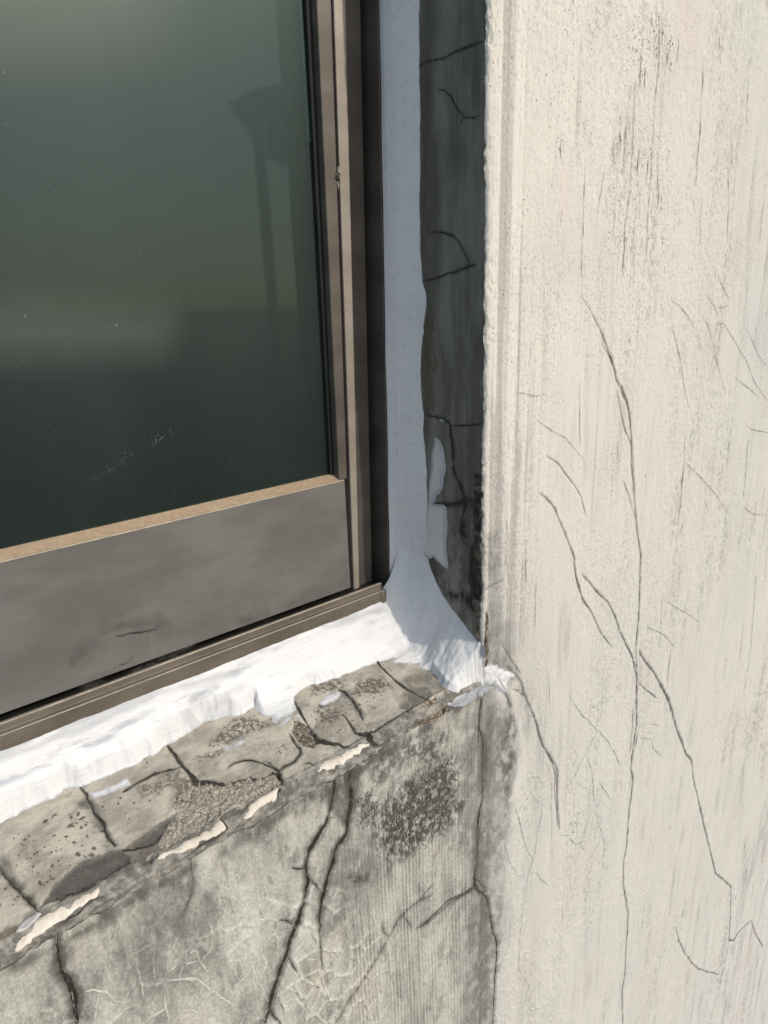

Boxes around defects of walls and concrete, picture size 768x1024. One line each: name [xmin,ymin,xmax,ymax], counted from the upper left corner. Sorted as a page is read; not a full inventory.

peeling [425,437,448,569]
damp [449,473,484,611]
spalling [280,682,389,754]
crack [549,299,763,1020]
crack [0,868,105,1024]
flaking render [15,888,99,952]
crack [80,786,153,851]
damp [102,868,188,924]
spalling [153,775,283,860]
crack [123,690,399,1024]
damp [303,722,464,856]
crack [337,650,560,1021]